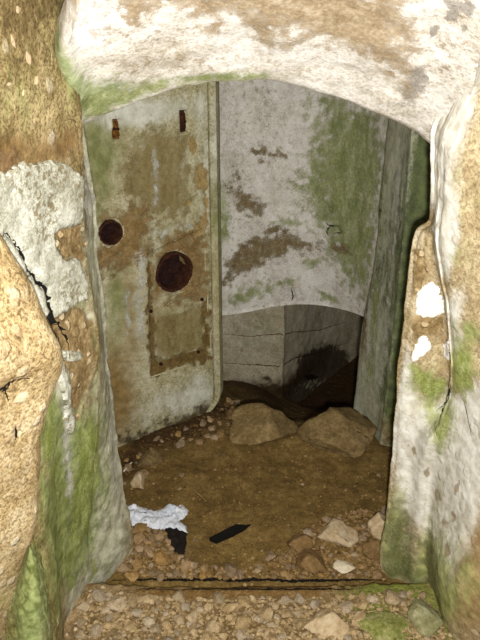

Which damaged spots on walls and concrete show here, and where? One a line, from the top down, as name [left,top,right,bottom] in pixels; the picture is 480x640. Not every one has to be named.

corrosion [97,201,213,378]
damp [261,344,349,403]